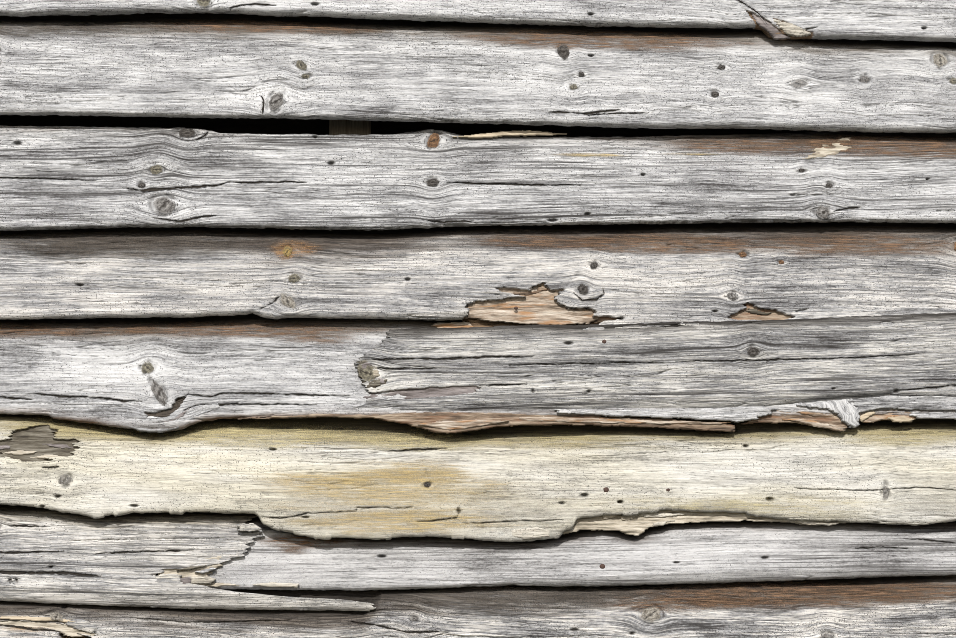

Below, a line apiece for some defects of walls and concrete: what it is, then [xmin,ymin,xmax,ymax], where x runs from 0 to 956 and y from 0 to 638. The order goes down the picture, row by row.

crack [176,393,335,410]
peeling [418,416,731,430]
peeling [782,411,847,431]
peeling [0,421,80,462]
peeling [0,616,98,637]